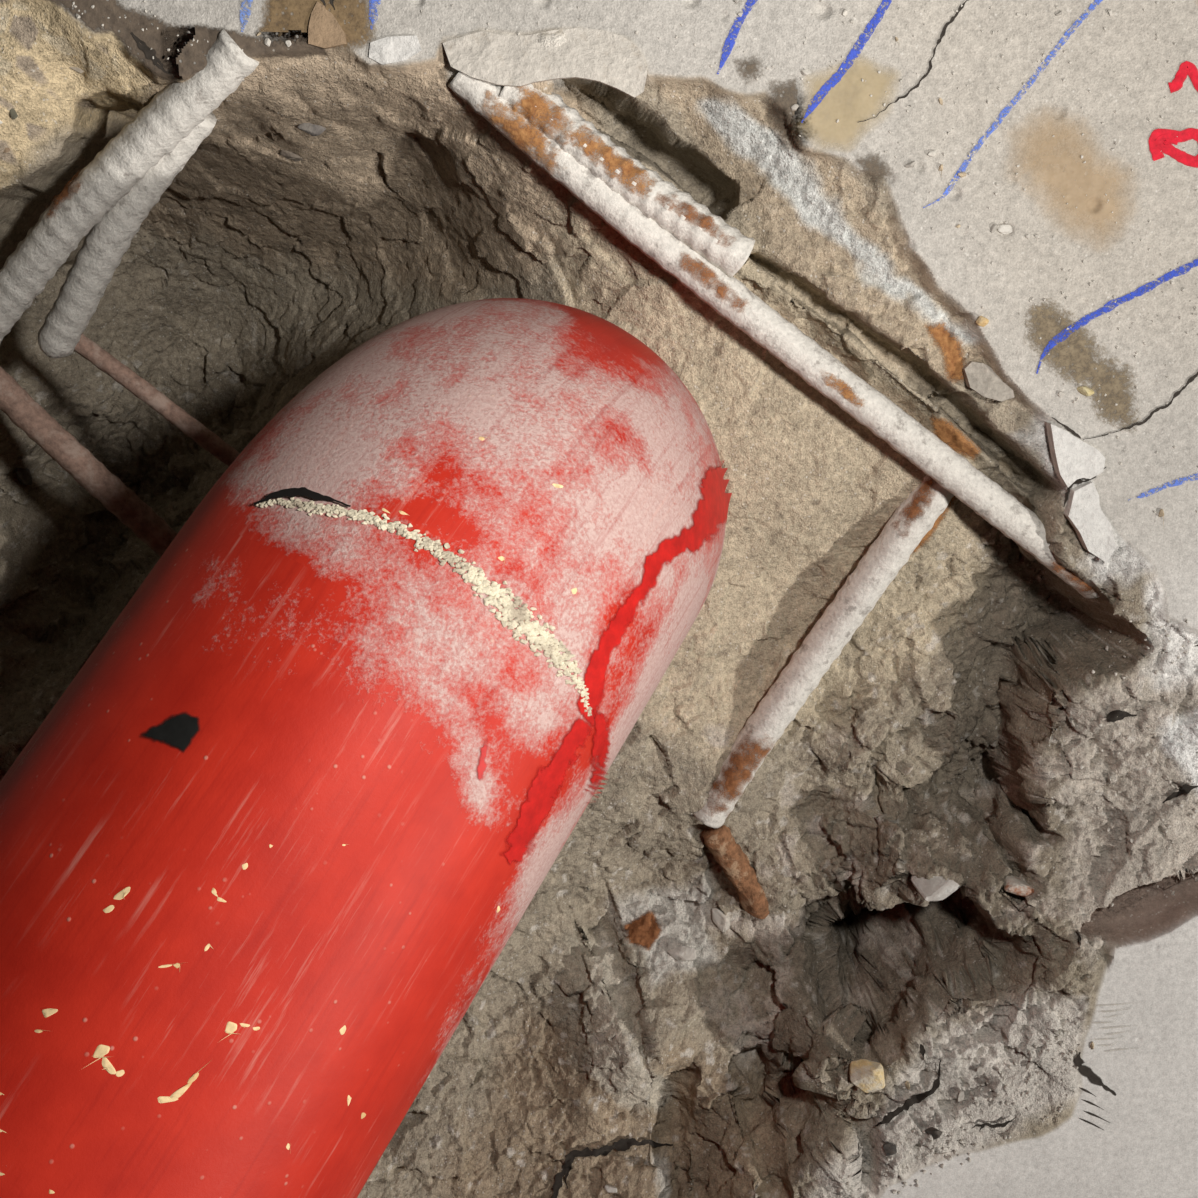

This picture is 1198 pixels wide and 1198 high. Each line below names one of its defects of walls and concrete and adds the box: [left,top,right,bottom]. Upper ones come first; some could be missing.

damp [50,0,374,84]
corrosion [808,64,889,142]
crack [859,0,968,122]
spalling [0,0,259,781]
spalling [448,71,1107,599]
corrosion [928,323,965,381]
corrosion [930,417,981,459]
damp [1026,299,1138,429]
crack [1064,467,1106,506]
crack [1052,372,1198,440]
spalling [1044,568,1198,993]
spalling [778,989,1100,1198]